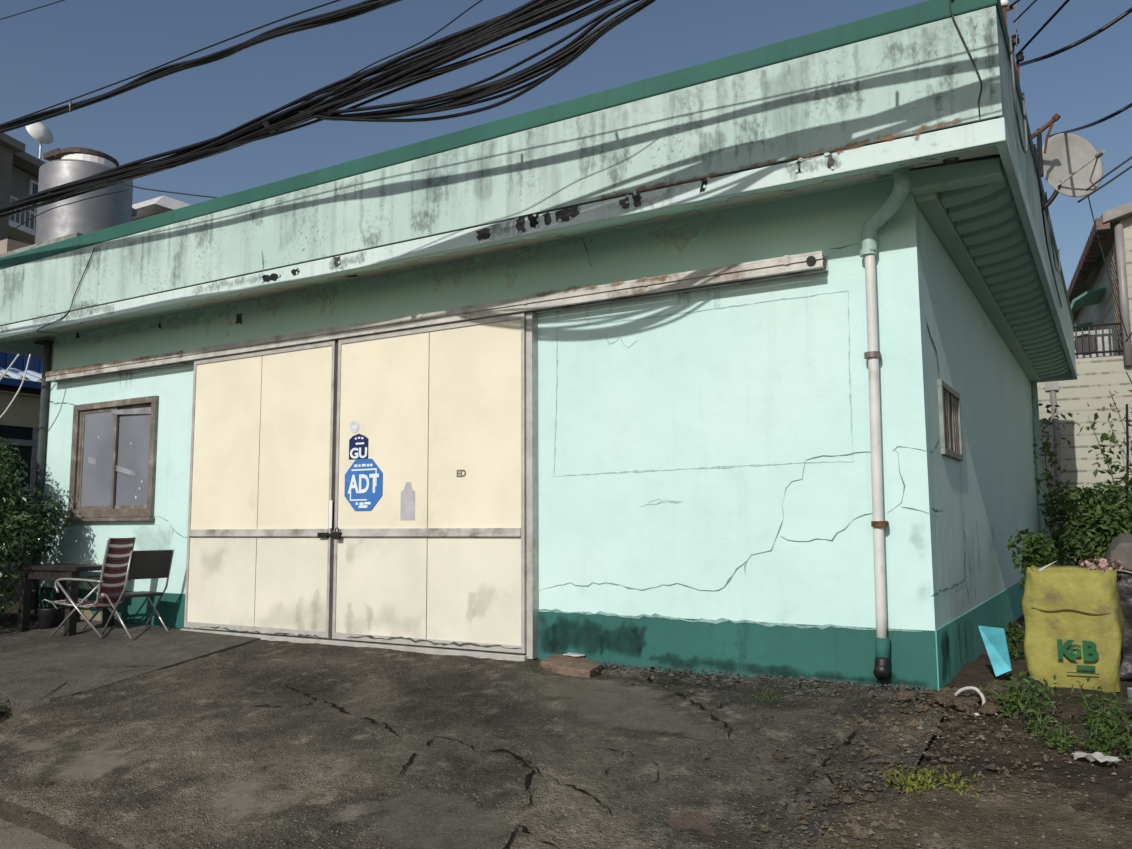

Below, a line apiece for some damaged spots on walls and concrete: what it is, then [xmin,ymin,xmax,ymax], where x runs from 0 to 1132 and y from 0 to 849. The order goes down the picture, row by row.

rust [601,172,724,199]
peeling [589,146,999,233]
rust [740,133,900,169]
rust [916,118,960,140]
peeling [177,205,581,324]
crack [541,291,971,604]